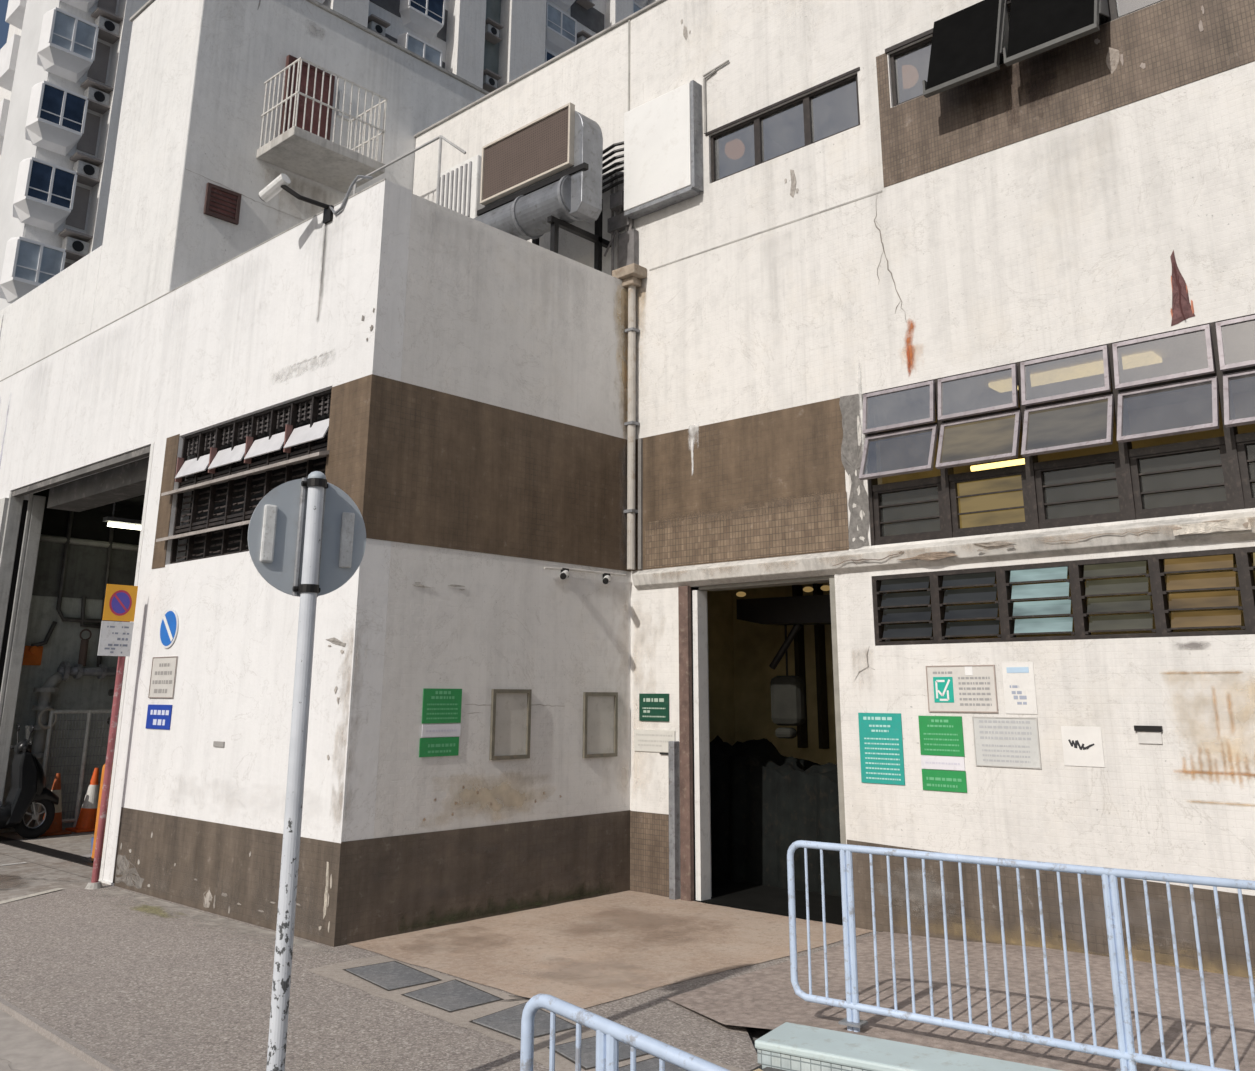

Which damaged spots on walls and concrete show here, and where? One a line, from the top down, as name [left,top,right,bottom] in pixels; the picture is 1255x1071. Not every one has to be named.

peeling [1094,38,1124,73]
crack [874,198,906,320]
corrosion [618,289,628,416]
corrosion [906,322,914,375]
peeling [645,394,869,568]